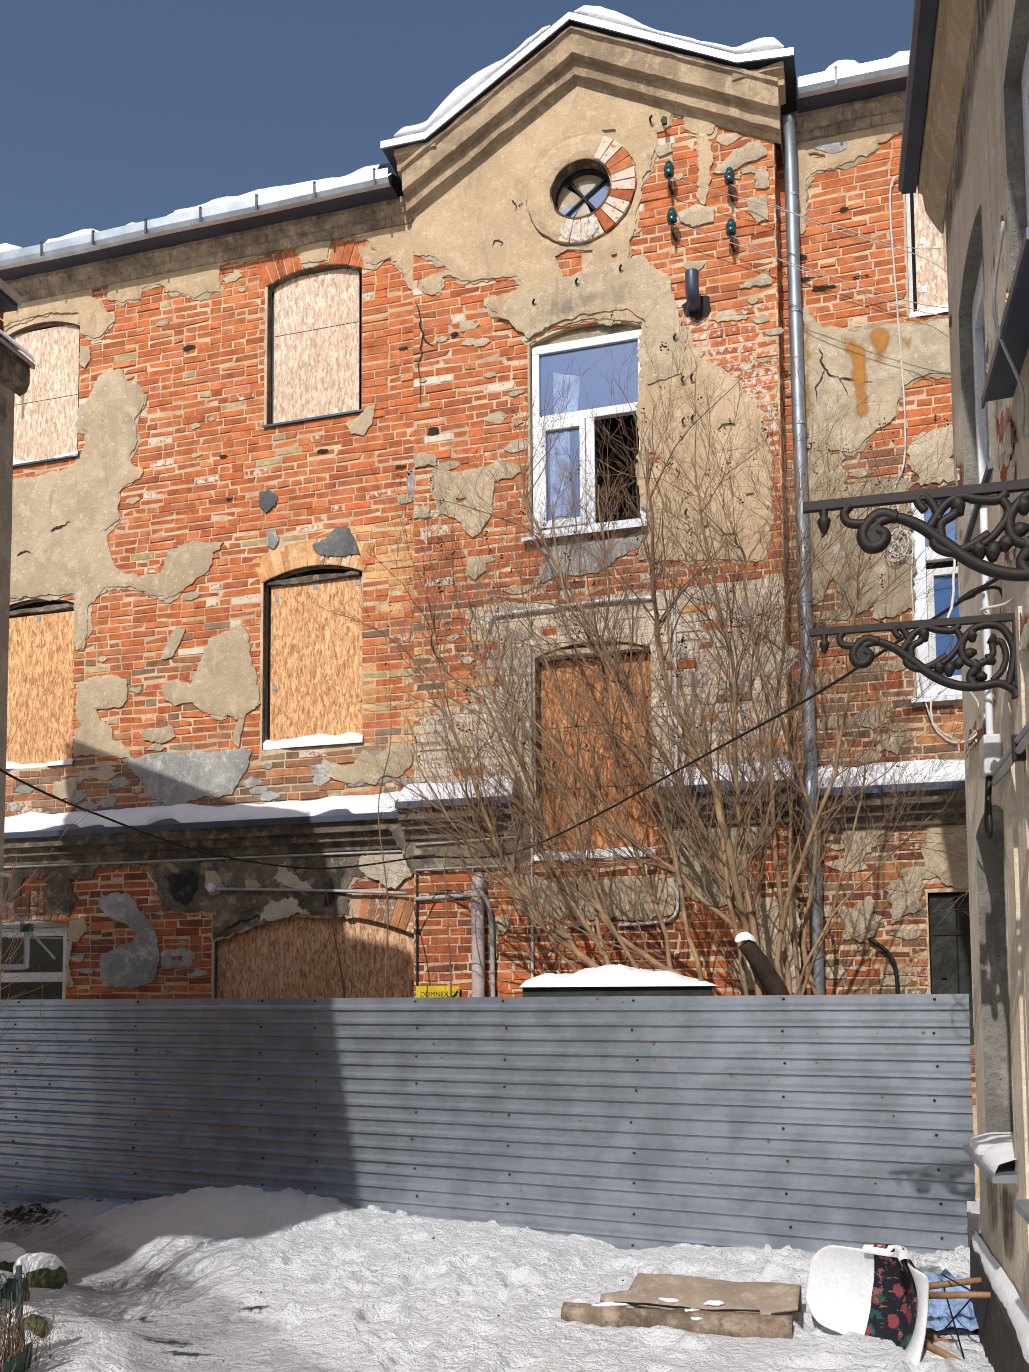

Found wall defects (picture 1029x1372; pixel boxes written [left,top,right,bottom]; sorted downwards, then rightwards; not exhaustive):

crack [415,301,435,405]
crack [815,349,871,398]
corrosion [845,327,889,417]
flaking render [13,433,85,479]
flaking render [66,118,969,997]
flaking render [8,785,50,814]
flaking render [5,864,212,999]